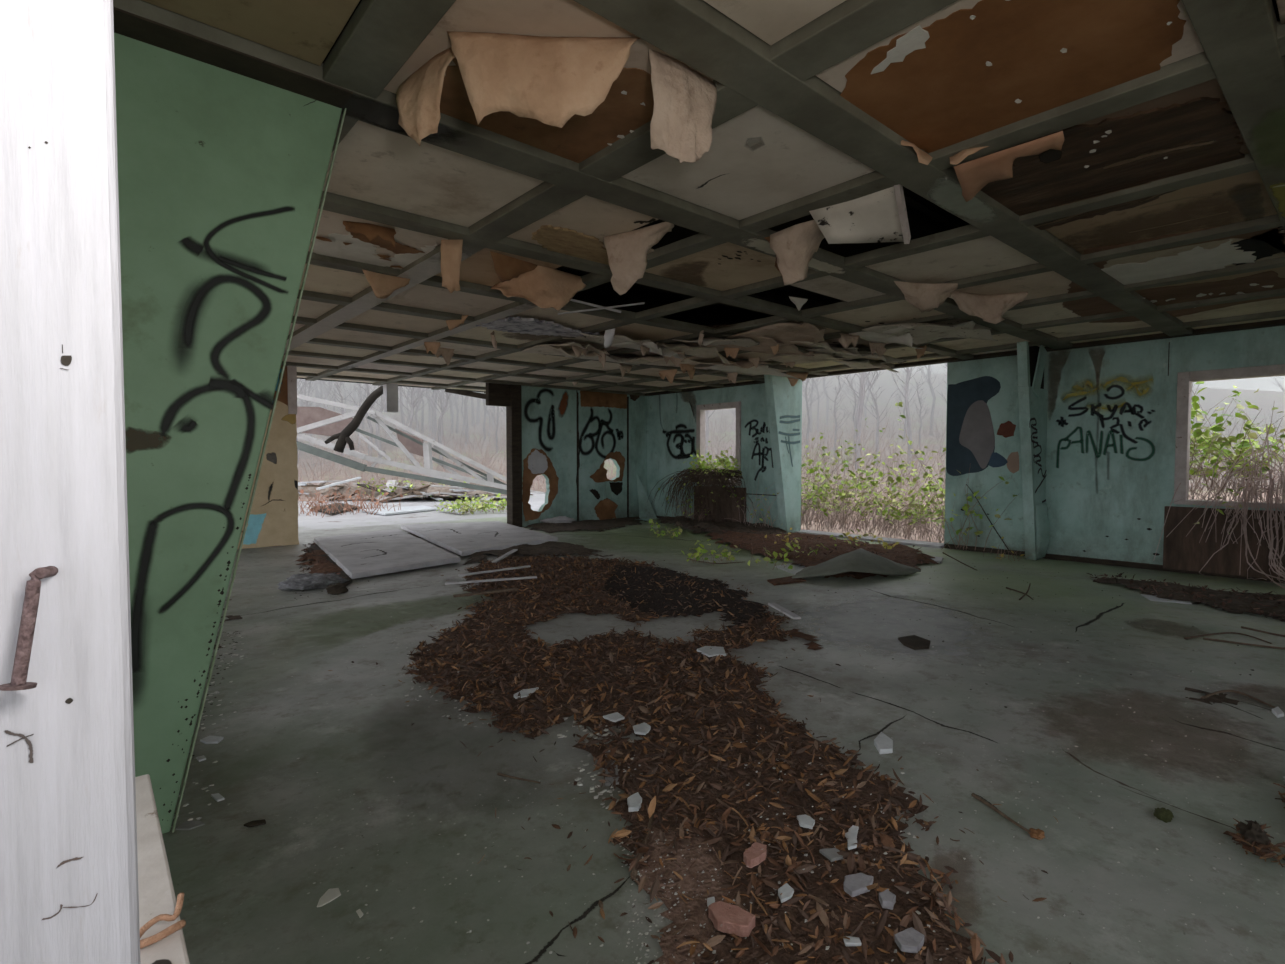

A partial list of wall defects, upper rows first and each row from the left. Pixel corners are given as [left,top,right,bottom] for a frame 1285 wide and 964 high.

peeling [1277,0,1285,24]
peeling [440,57,654,163]
peeling [840,0,1186,220]
peeling [808,258,845,274]
peeling [348,303,538,367]
hole [522,448,559,521]
spalling [589,451,625,499]
crack [779,666,997,750]
crack [525,876,631,964]